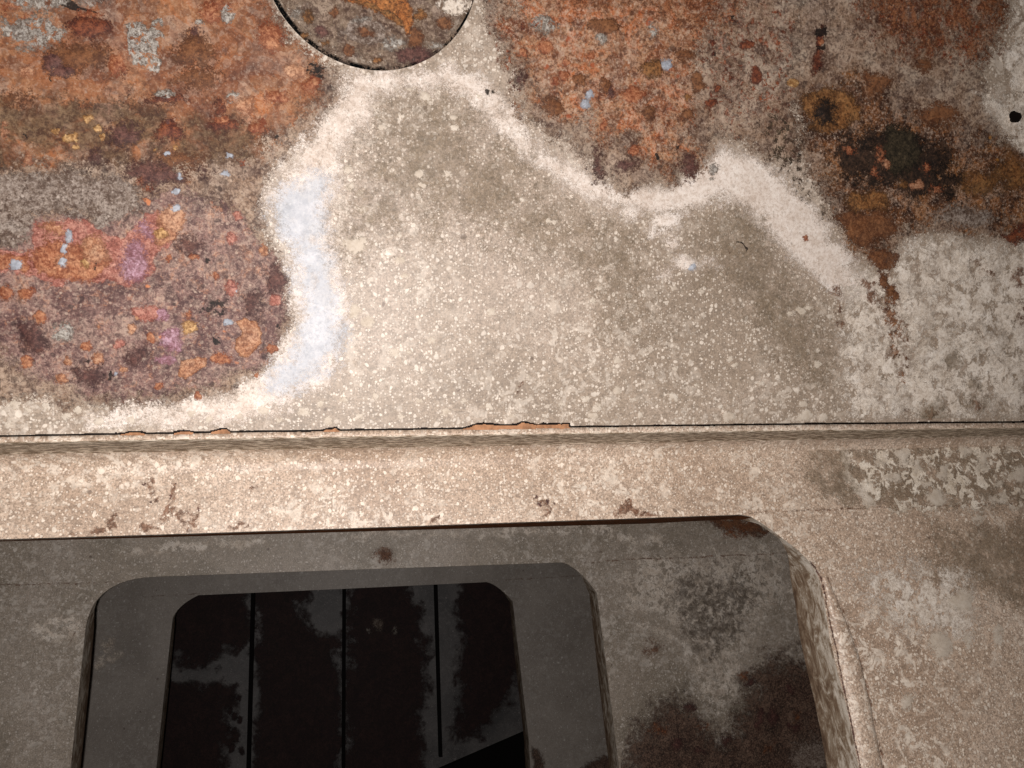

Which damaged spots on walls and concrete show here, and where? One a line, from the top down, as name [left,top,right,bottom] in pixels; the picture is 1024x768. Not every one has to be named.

corrosion [0,0,1024,416]
spalling [463,421,570,430]
leakage [83,58,1024,432]
leakage [349,525,795,727]